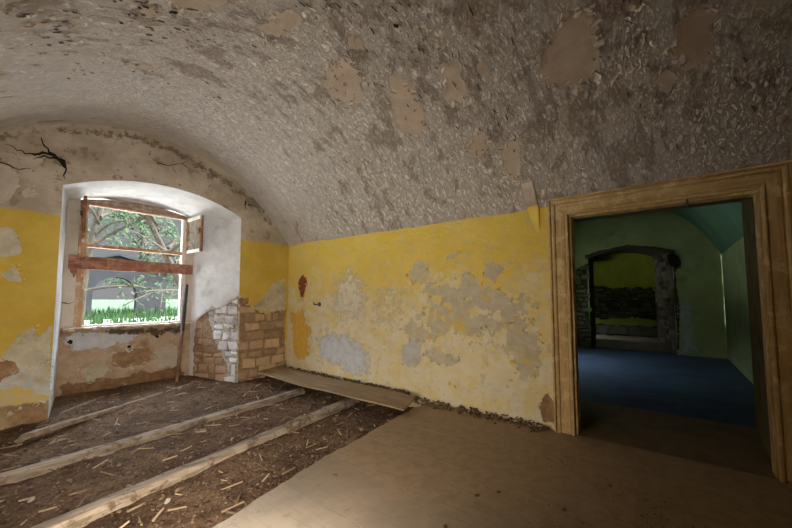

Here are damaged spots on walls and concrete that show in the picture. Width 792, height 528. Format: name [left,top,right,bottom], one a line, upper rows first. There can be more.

peeling [118,0,224,47]
peeling [251,1,317,48]
peeling [319,0,520,152]
flaking render [524,0,649,98]
crack [0,137,70,179]
peeling [0,227,25,282]
flaking render [193,278,287,383]
peeling [399,261,545,382]
peeling [0,324,54,427]
flaking render [77,335,178,388]
flaking render [539,393,554,423]